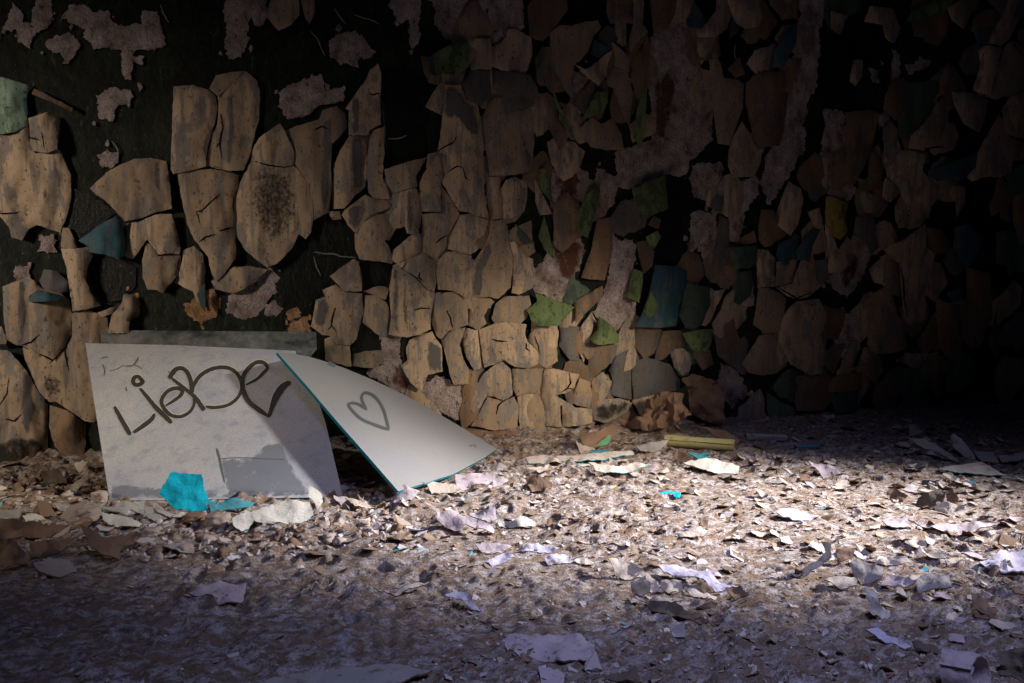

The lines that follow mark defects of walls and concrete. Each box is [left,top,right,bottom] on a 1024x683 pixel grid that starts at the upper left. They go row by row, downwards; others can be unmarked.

crack [196,195,232,242]
leakage [252,169,295,234]
peeling [0,0,1024,492]
crack [49,336,71,371]